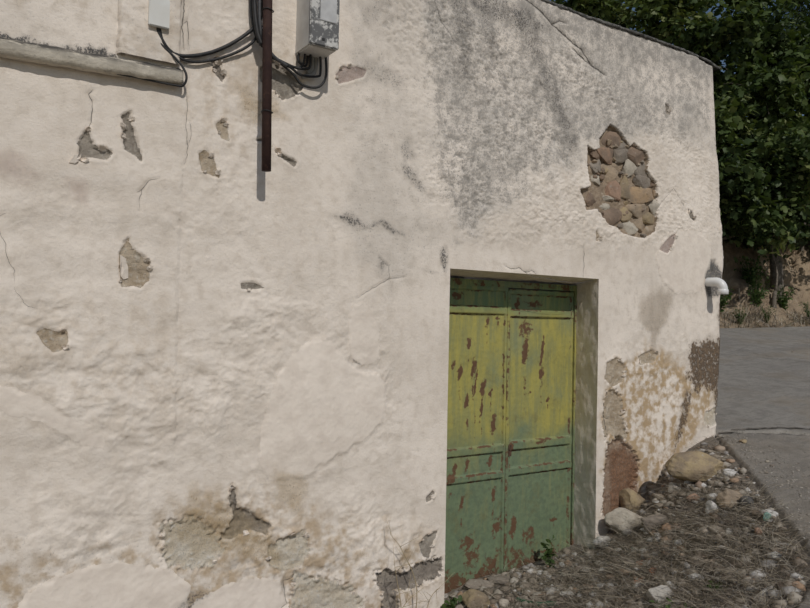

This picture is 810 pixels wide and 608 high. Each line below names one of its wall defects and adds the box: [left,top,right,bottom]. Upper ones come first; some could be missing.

crack [527,0,601,73]
peeling [335,63,366,83]
spalling [69,127,112,164]
spalling [120,111,142,161]
spalling [199,150,221,178]
spalling [580,125,660,238]
spalling [118,238,153,288]
spalling [36,328,70,352]
spalling [638,350,659,365]
spalling [602,357,641,531]
spalling [159,485,364,608]
spalling [372,531,442,608]